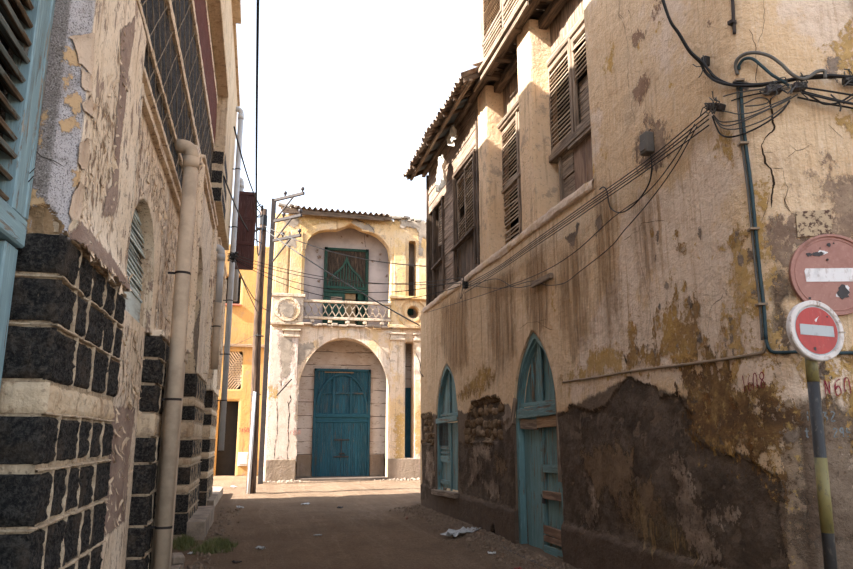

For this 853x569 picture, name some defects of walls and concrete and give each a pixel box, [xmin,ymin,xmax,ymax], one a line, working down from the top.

peeling [811,16,853,75]
peeling [27,10,138,295]
crack [761,100,808,222]
peeling [104,323,145,542]
spalling [458,365,516,510]
spalling [558,174,807,569]
peeling [818,345,853,440]